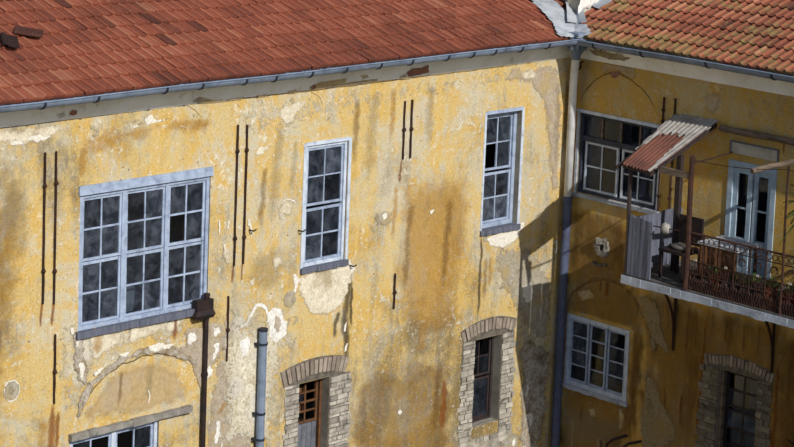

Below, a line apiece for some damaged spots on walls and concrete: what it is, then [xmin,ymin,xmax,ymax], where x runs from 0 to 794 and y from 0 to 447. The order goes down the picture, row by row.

flaking render [56,259,355,447]
flaking render [449,222,558,447]